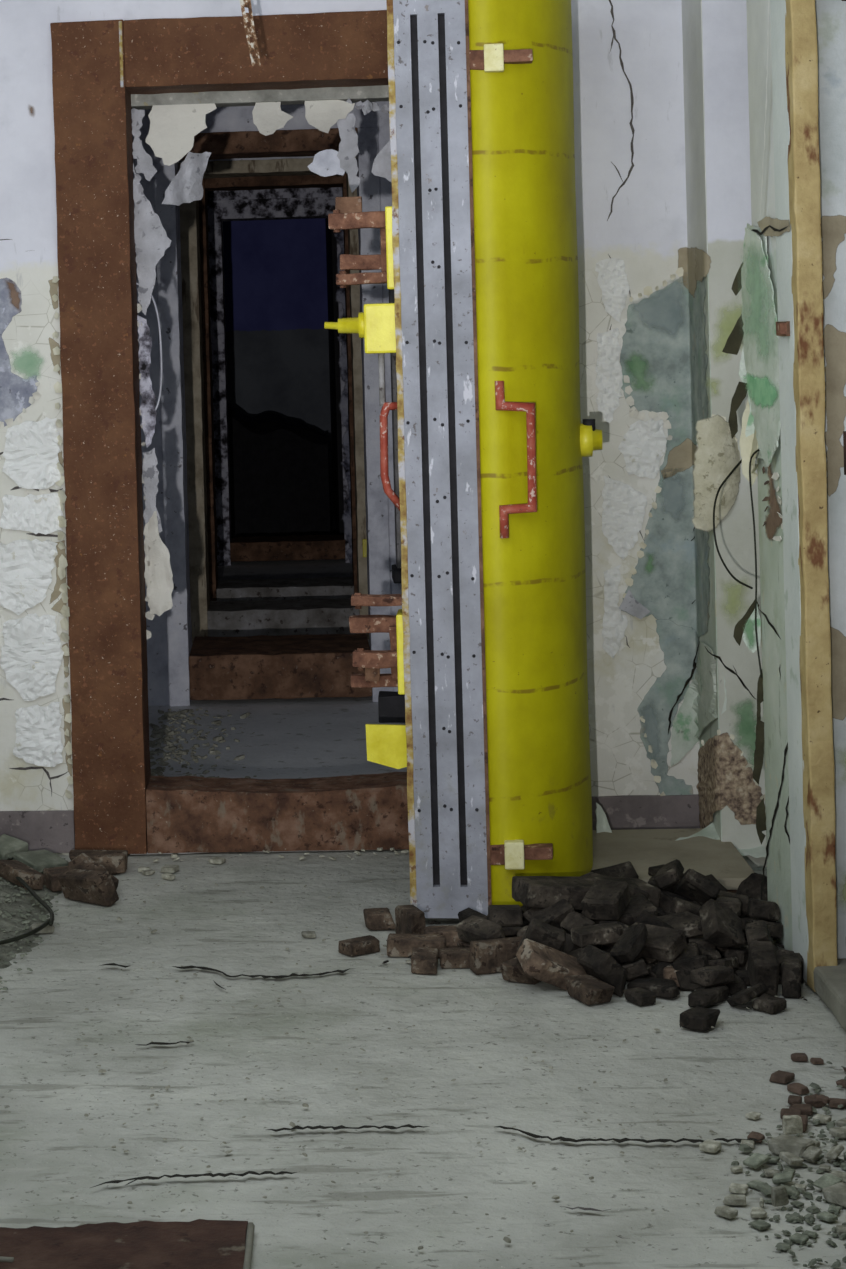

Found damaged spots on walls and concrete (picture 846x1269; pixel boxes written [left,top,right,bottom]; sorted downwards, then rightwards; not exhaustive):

peeling [252,98,392,192]
crack [607,0,635,221]
peeling [722,216,790,541]
peeling [823,324,846,496]
peeling [0,276,73,799]
peeling [595,247,767,845]
peeling [830,627,846,720]
crack [761,742,790,900]
crack [172,965,350,990]
crack [90,1171,297,1188]
crack [267,1124,429,1132]
crack [496,1126,763,1143]